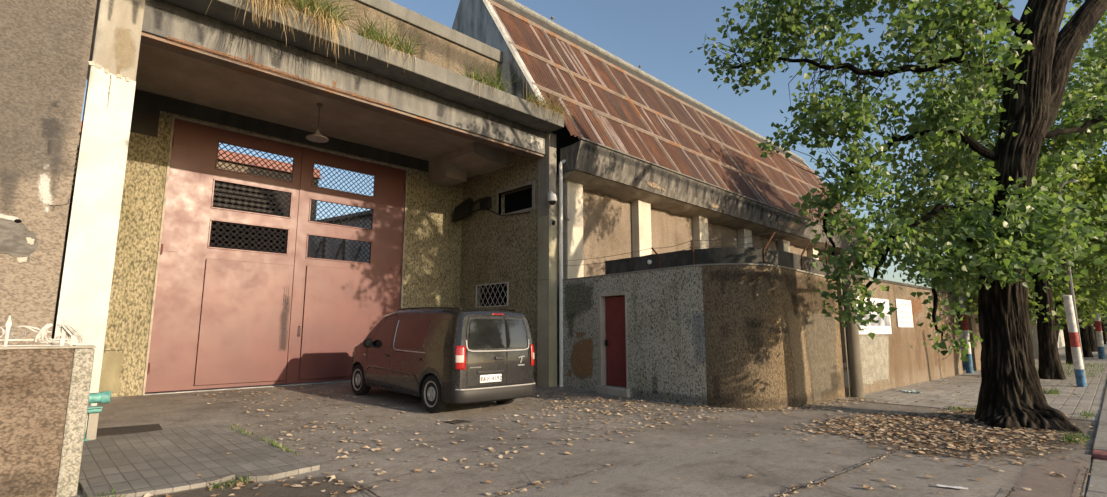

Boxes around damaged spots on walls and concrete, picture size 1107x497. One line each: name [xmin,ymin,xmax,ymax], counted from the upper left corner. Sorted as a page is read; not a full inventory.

peeling [38,164,52,212]
peeling [569,332,593,379]
crack [356,442,621,497]
crack [777,451,897,497]